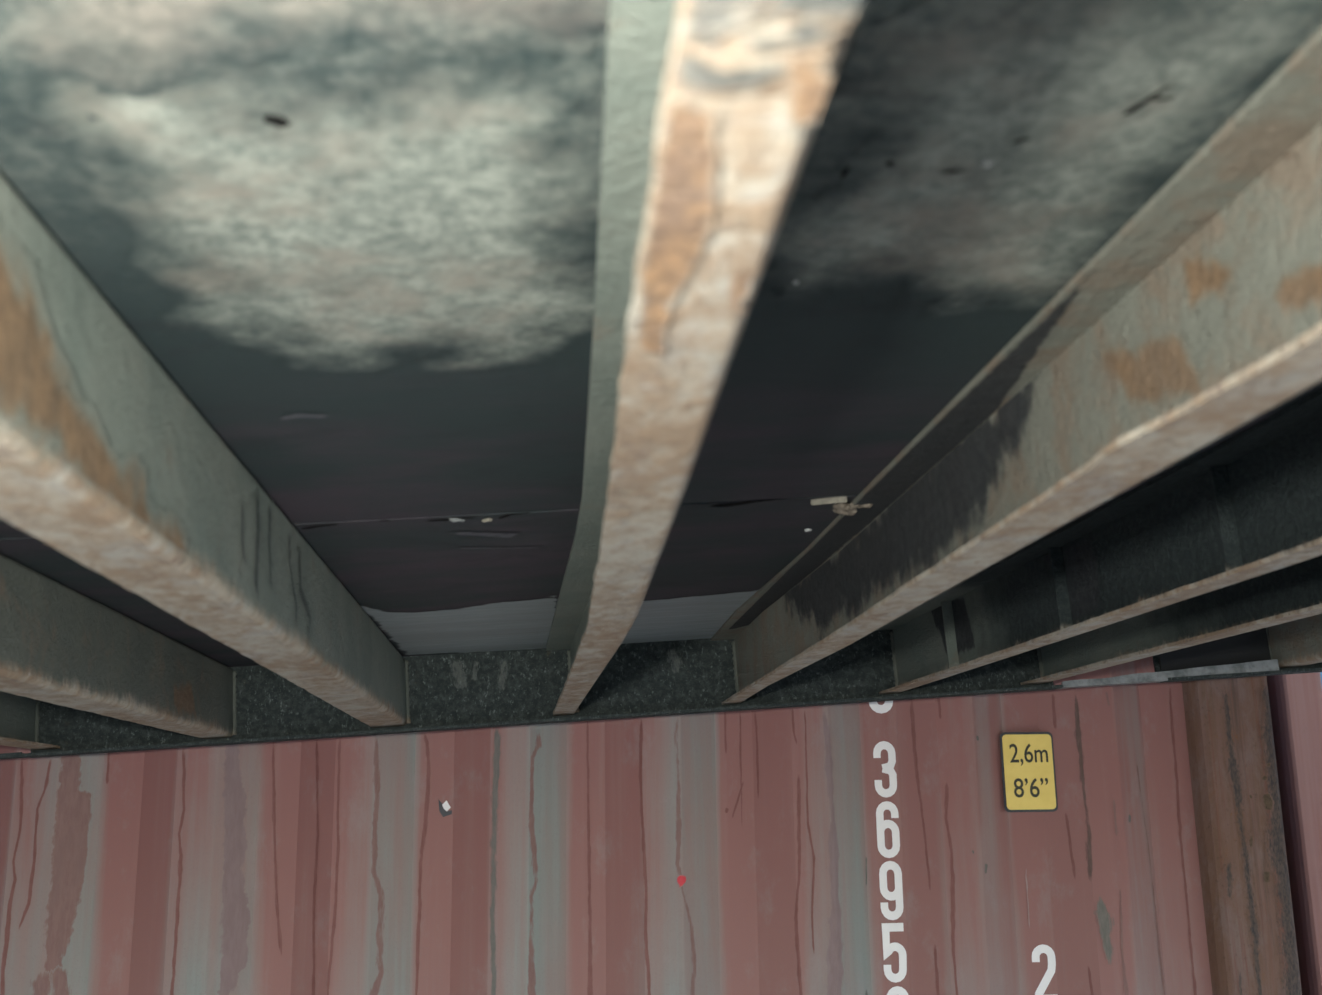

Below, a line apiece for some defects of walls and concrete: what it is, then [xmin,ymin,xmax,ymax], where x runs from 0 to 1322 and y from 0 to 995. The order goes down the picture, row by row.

rust [786,59,832,127]
leakage [0,0,609,375]
rust [633,103,722,357]
leakage [762,0,1322,317]
rust [721,267,760,315]
rust [1180,246,1237,316]
rust [1269,255,1322,320]
rust [0,229,188,554]
rust [1097,327,1205,415]
crack [710,499,782,507]